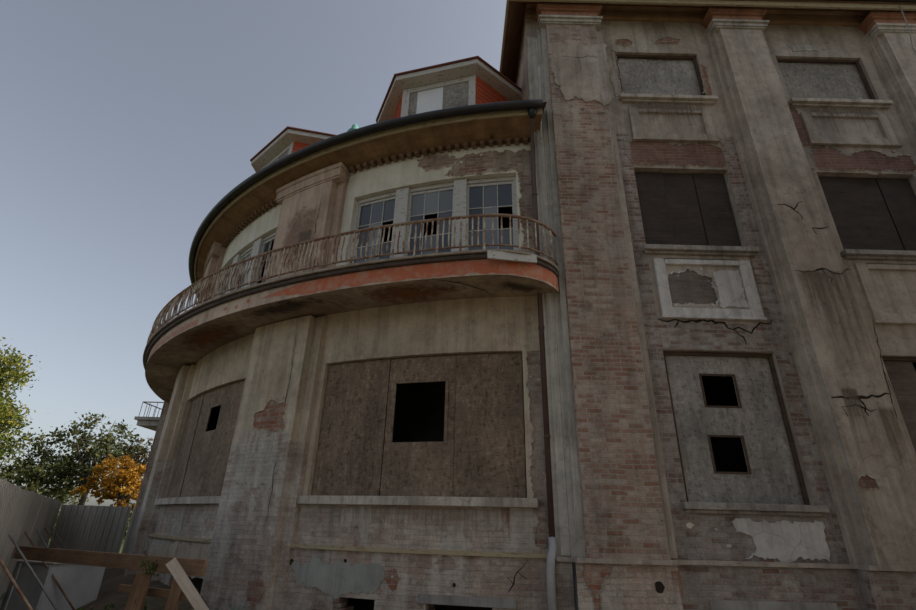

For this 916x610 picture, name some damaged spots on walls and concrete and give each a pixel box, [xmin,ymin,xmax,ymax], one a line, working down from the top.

peeling [546,39,633,113]
peeling [263,148,559,298]
crack [778,201,827,234]
flaking render [667,267,749,308]
crack [794,268,851,285]
crack [658,319,772,345]
crack [831,324,897,417]
flaking render [252,396,288,437]
peeling [730,518,830,562]
flaking render [581,563,614,610]